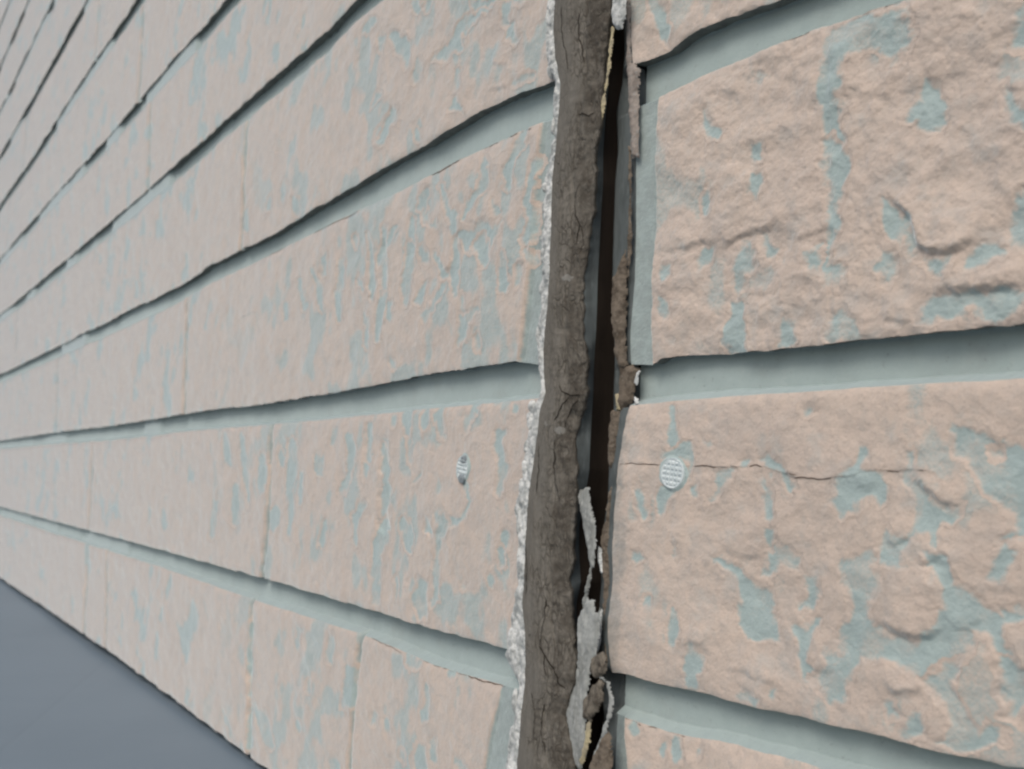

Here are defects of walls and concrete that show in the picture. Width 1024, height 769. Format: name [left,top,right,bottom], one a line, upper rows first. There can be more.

crack [561,15,585,69]
peeling [902,67,951,137]
peeling [742,138,768,206]
peeling [796,0,920,344]
peeling [505,0,560,769]
spalling [577,19,625,655]
peeling [718,227,783,355]
peeling [774,314,801,349]
peeling [869,182,1024,329]
crack [694,464,927,480]
peeling [632,402,1024,757]
spalling [582,701,604,769]